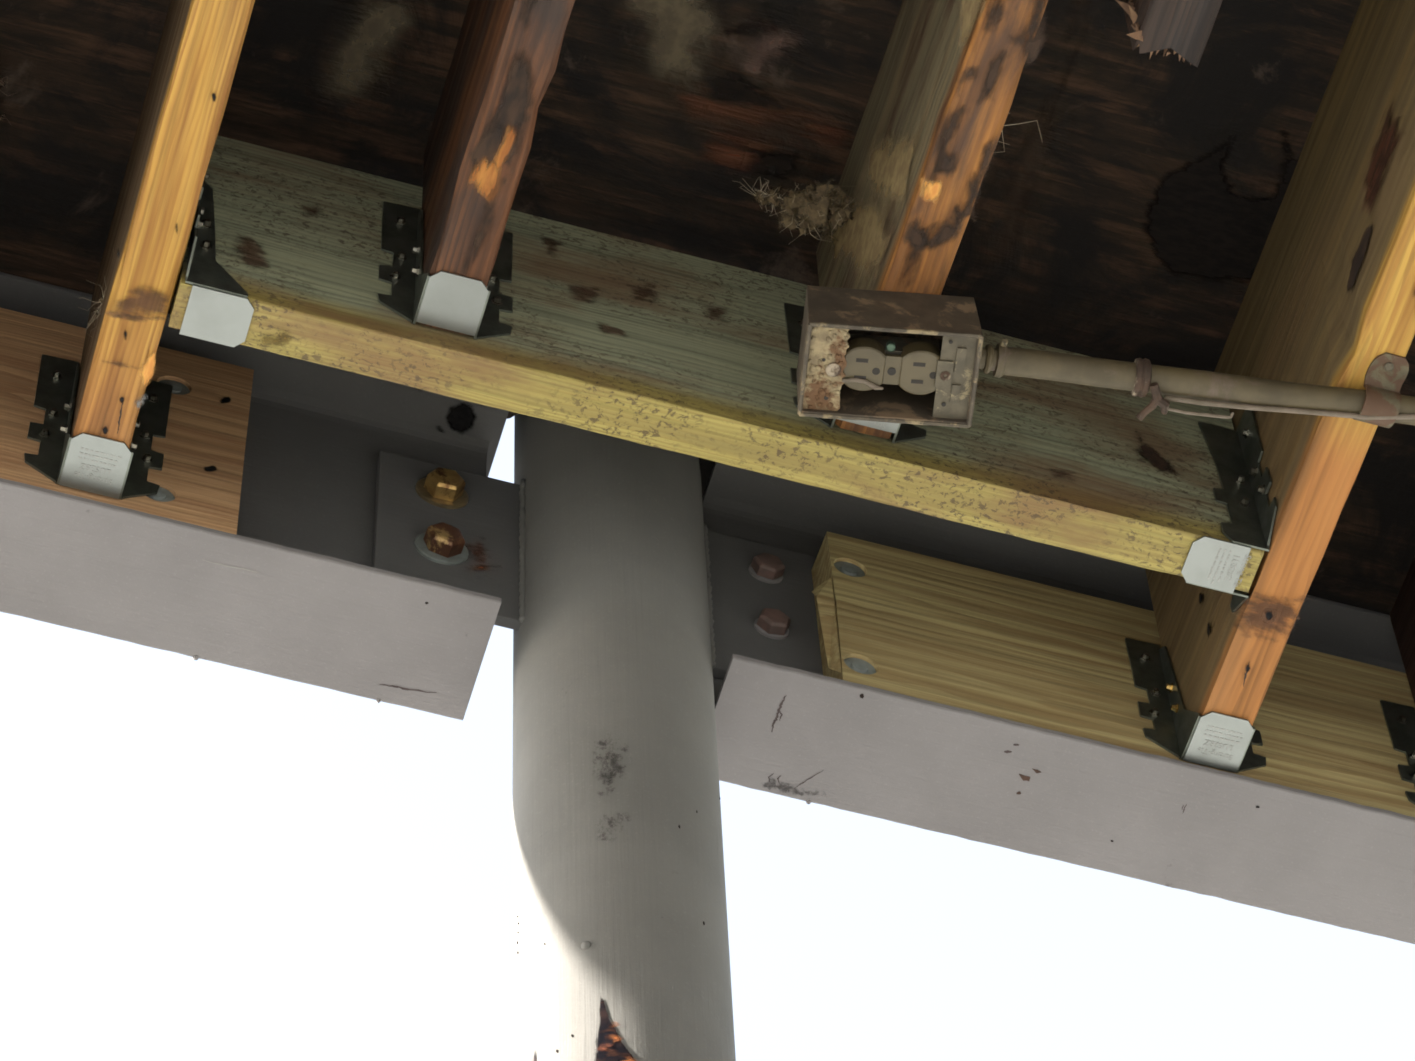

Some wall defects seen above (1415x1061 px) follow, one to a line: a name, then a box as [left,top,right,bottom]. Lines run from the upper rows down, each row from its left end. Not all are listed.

leakage [958,0,1047,101]
leakage [930,106,964,181]
leakage [904,140,998,275]
peeling [594,999,636,1061]